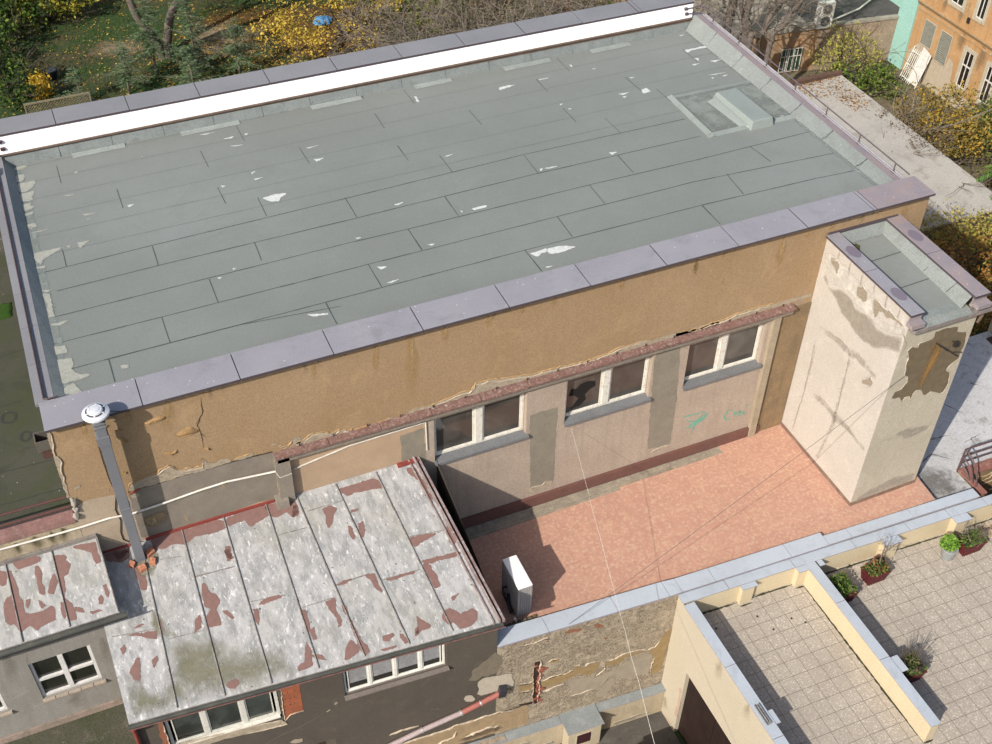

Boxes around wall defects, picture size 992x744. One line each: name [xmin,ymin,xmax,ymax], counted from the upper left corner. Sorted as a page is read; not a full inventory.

spalling [408,294,811,414]
leakage [833,291,900,350]
peeling [892,327,966,403]
spalling [47,433,81,520]
peeling [339,478,382,496]
peeling [151,501,299,551]
peeling [0,542,147,632]
peeling [129,656,158,681]
peeling [194,583,234,633]
peeling [297,599,326,671]
spalling [389,607,672,744]
spalling [182,685,304,744]